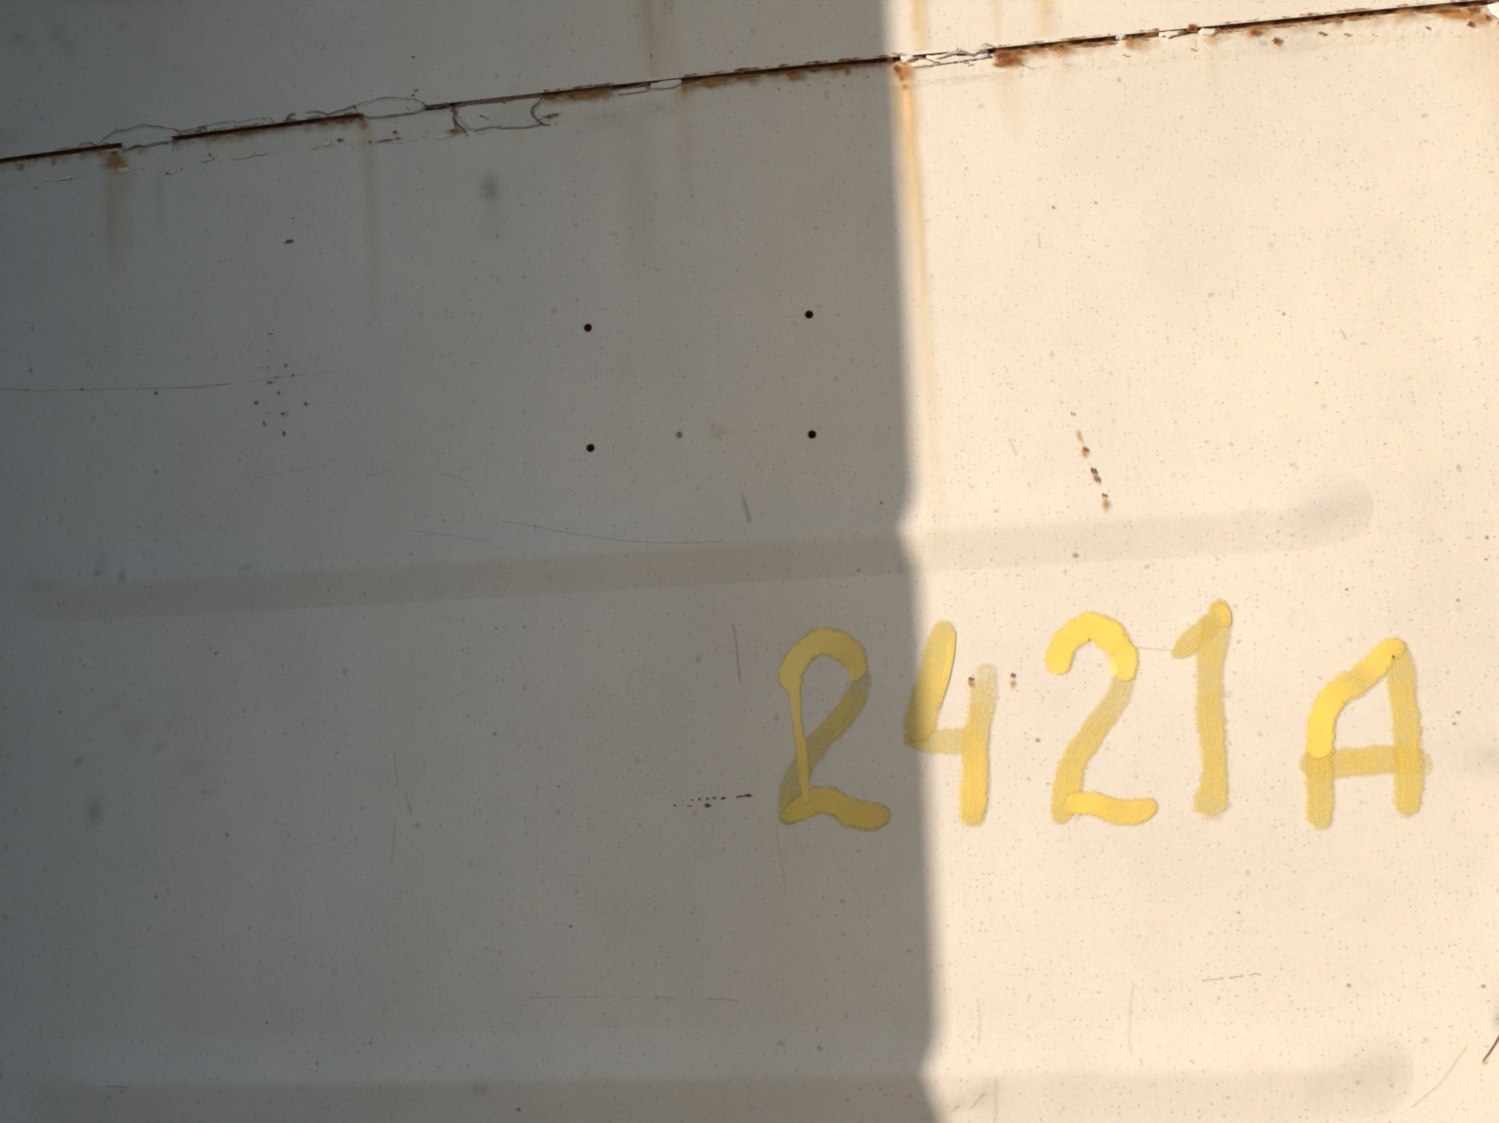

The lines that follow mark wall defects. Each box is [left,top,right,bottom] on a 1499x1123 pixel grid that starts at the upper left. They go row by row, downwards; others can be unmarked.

corrosion [1215,8,1375,44]
corrosion [1398,0,1499,29]
peeling [1488,2,1499,19]
corrosion [993,28,1159,67]
peeling [437,97,541,139]
corrosion [538,83,614,120]
corrosion [681,55,910,126]
corrosion [1078,433,1107,508]